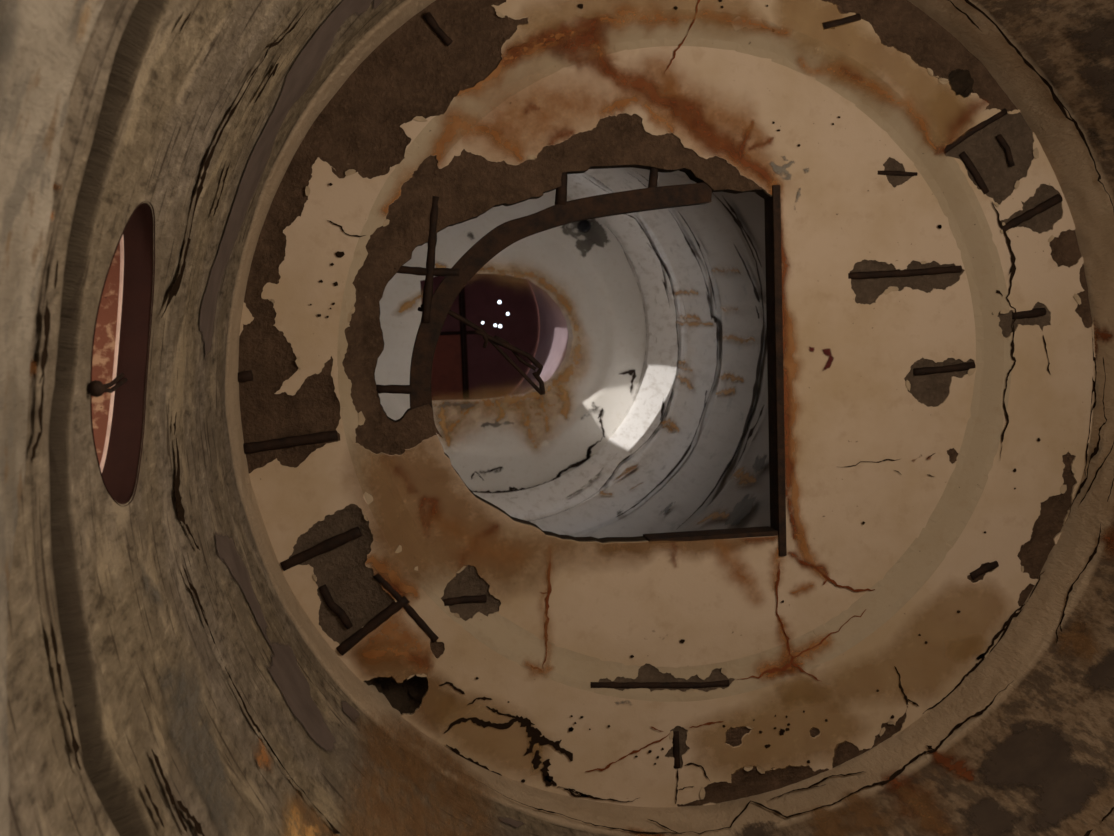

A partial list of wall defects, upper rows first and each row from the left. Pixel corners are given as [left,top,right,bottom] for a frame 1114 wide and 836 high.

damp [0,0,17,95]
spalling [238,0,767,473]
crack [471,174,679,521]
rust [432,7,789,195]
rust [601,229,828,594]
spalling [822,0,1092,328]
crack [992,202,1018,459]
spalling [1017,452,1076,606]
rust [358,615,455,725]
crack [439,551,1044,834]
damp [959,719,1107,836]
damp [1083,650,1114,692]